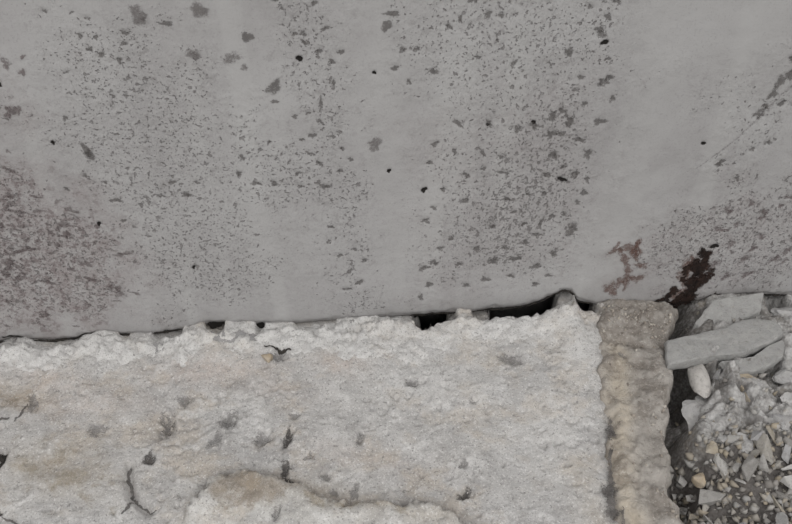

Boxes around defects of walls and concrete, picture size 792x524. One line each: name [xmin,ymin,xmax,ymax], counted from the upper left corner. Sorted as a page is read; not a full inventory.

corrosion [604,239,647,296]
corrosion [654,248,716,309]